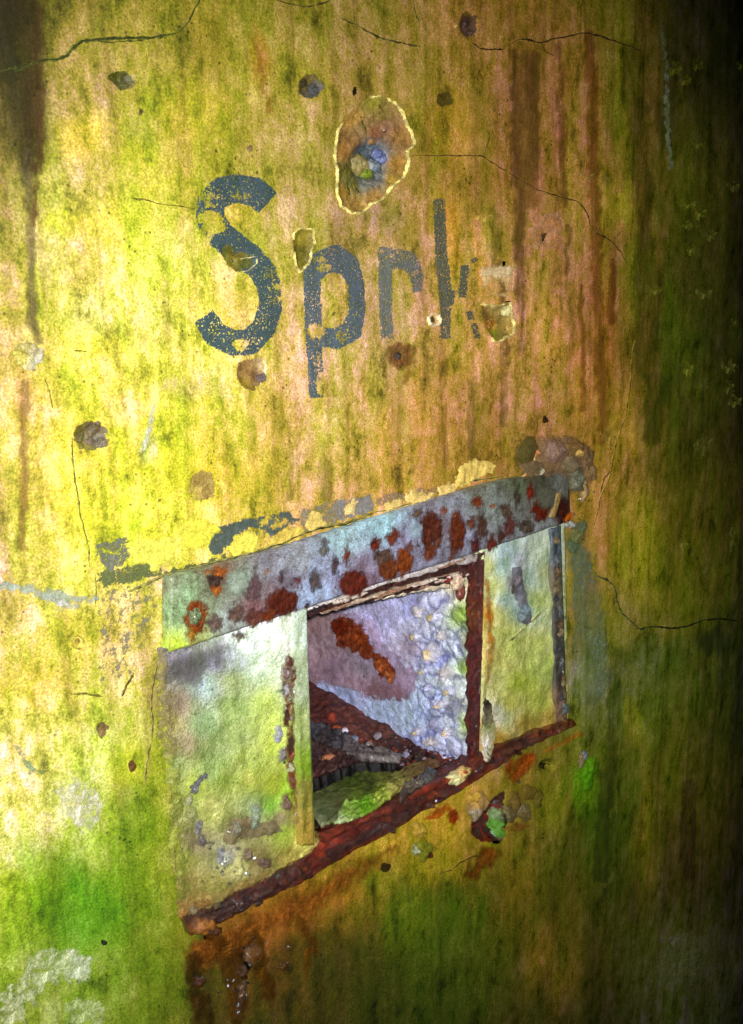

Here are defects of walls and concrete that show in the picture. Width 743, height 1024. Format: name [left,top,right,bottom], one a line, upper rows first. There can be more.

crack [0,0,200,76]
spalling [333,87,416,215]
crack [411,130,627,263]
leakage [501,50,538,308]
leakage [28,238,39,342]
leakage [19,462,27,521]
corrosion [370,483,572,581]
corrosion [183,566,322,644]
peeling [96,487,438,681]
corrosion [331,615,395,683]
crack [590,567,741,635]
spalling [471,791,506,843]